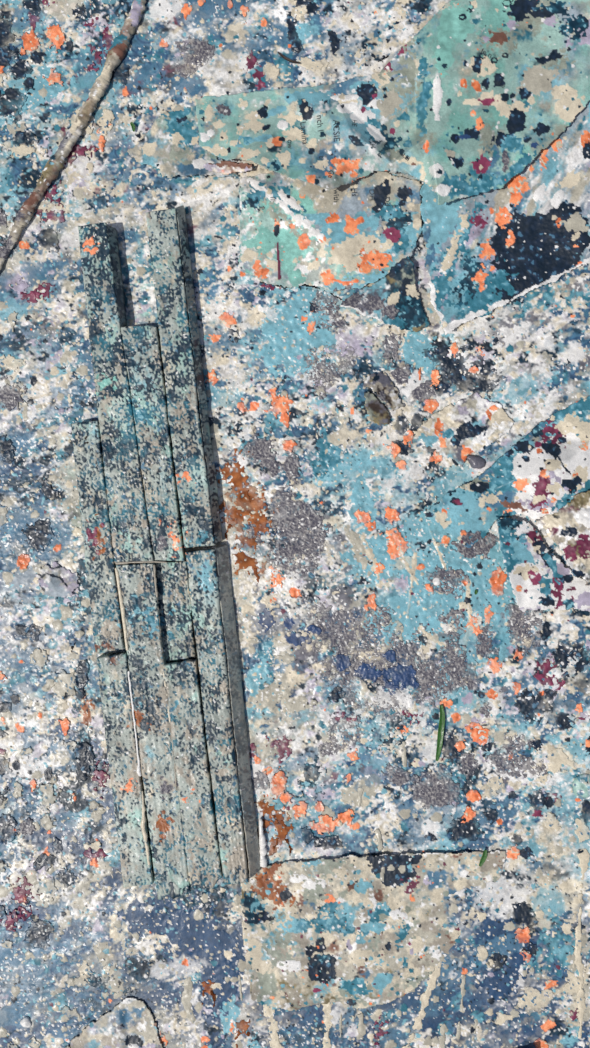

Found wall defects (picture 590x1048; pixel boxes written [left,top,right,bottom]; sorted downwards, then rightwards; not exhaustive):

peeling [127,106,239,179]
peeling [363,372,405,426]
peeling [413,392,514,468]
corrosion [216,448,279,584]